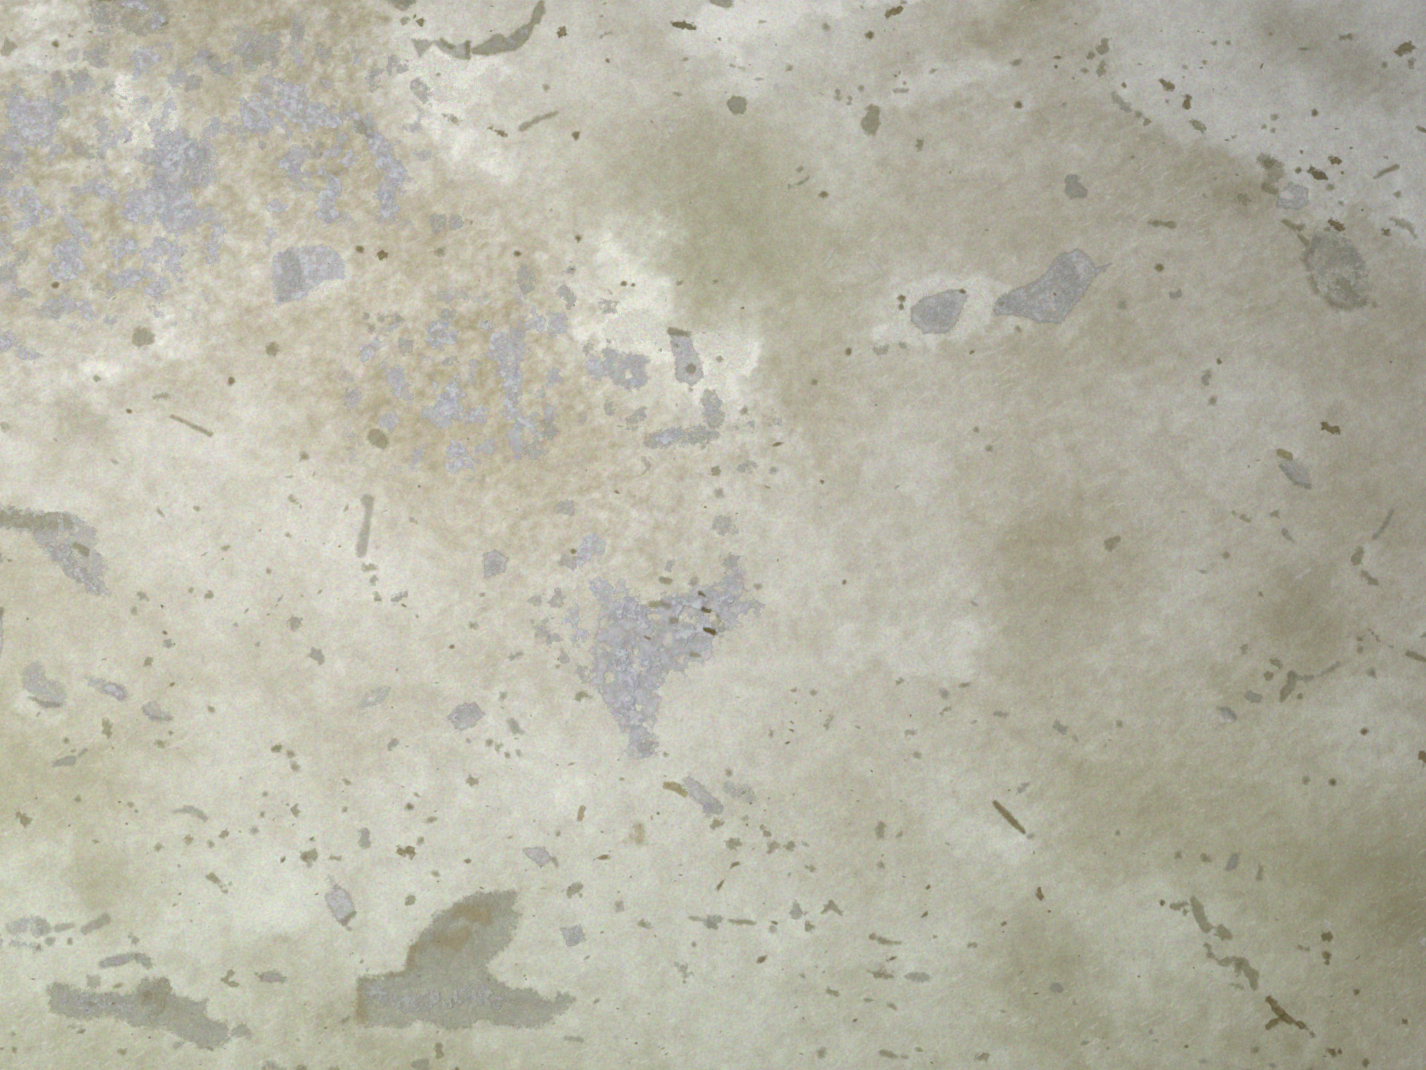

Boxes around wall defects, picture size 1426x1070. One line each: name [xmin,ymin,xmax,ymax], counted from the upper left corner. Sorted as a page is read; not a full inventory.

spalling [443,1,544,55]
peeling [0,0,430,329]
spalling [898,289,967,333]
spalling [993,249,1111,330]
peeling [359,252,576,474]
spalling [583,344,648,391]
spalling [0,506,104,594]
spalling [528,532,765,760]
spalling [48,939,229,1048]